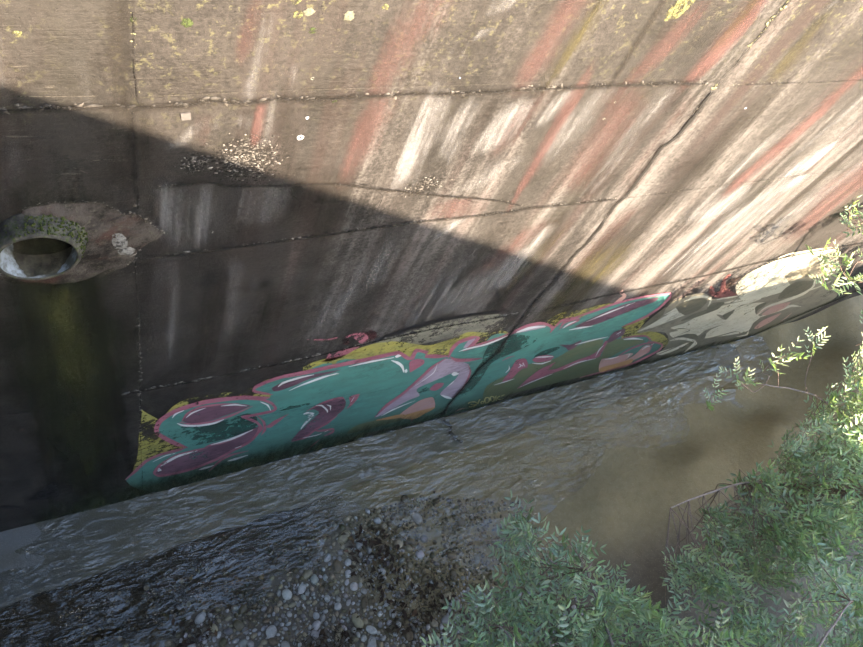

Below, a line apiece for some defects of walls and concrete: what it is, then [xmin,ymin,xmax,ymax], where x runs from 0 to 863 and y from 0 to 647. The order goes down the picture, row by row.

leakage [482,106,529,147]
flaking render [180,133,288,184]
leakage [490,224,557,291]